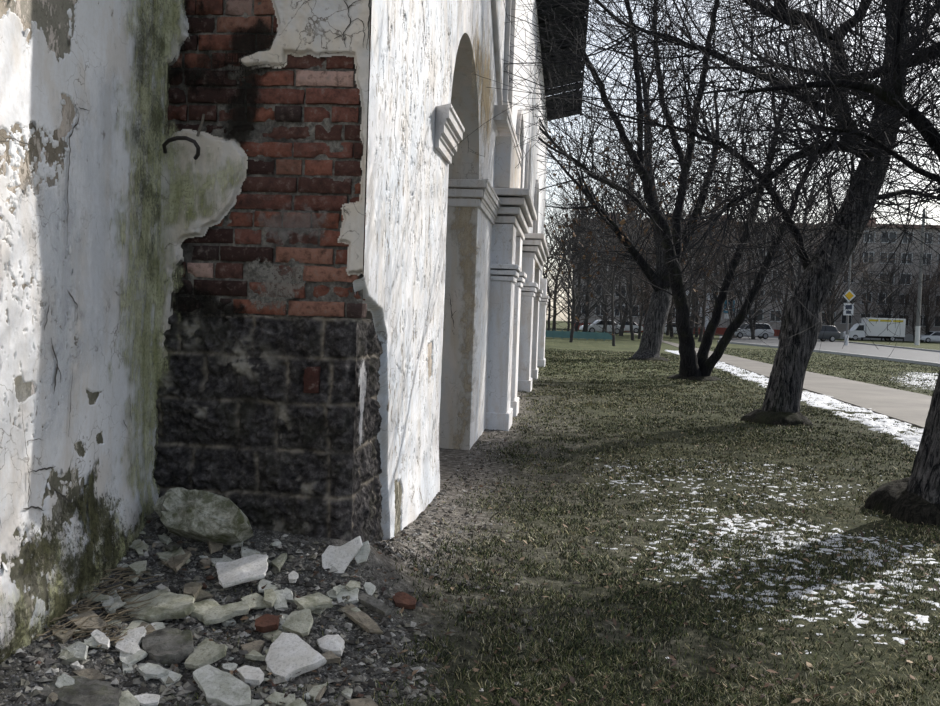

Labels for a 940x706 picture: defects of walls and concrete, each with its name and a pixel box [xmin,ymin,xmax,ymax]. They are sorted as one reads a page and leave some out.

flaking render [0,0,78,63]
crack [334,0,389,50]
peeling [0,93,80,247]
leakage [135,1,165,281]
peeling [4,261,78,349]
spalling [152,0,402,543]
peeling [14,371,52,403]
crack [44,307,73,436]
peeling [86,389,101,405]
crack [22,404,87,536]
leakage [0,485,135,664]